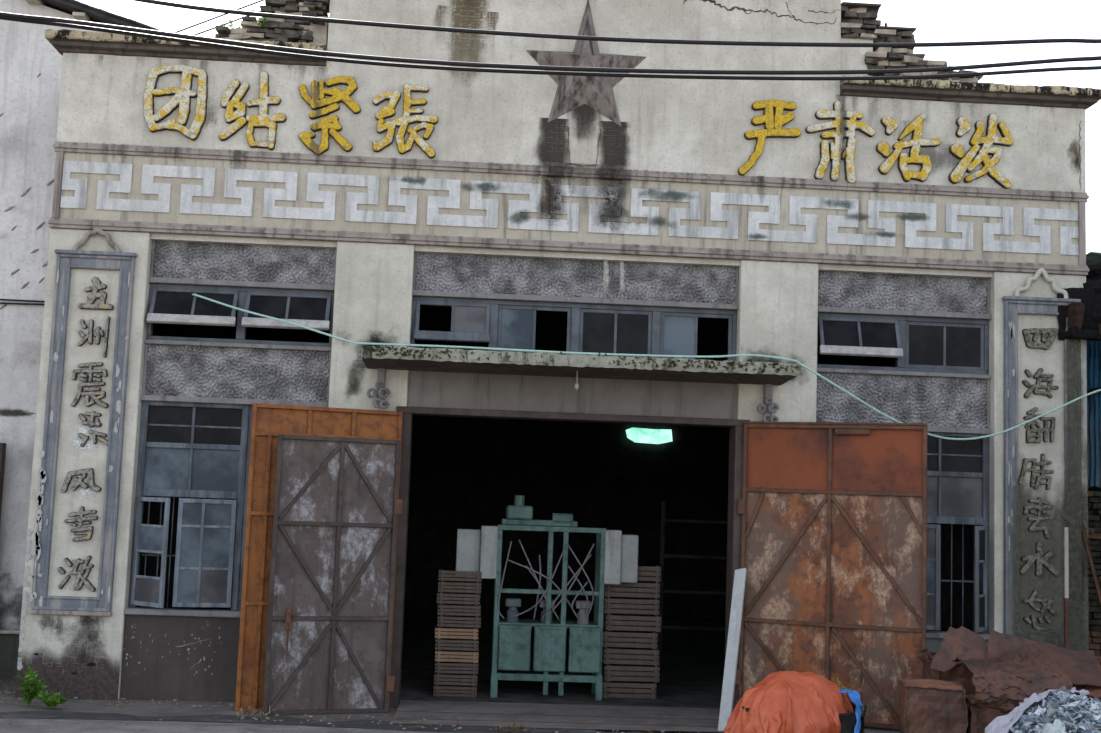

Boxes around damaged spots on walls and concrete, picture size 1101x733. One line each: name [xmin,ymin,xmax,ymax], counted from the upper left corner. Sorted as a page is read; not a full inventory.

crack [682,0,837,24]
damp [437,0,498,68]
damp [534,104,632,227]
damp [641,190,687,200]
damp [512,212,528,222]
damp [604,260,624,288]
damp [15,615,120,700]